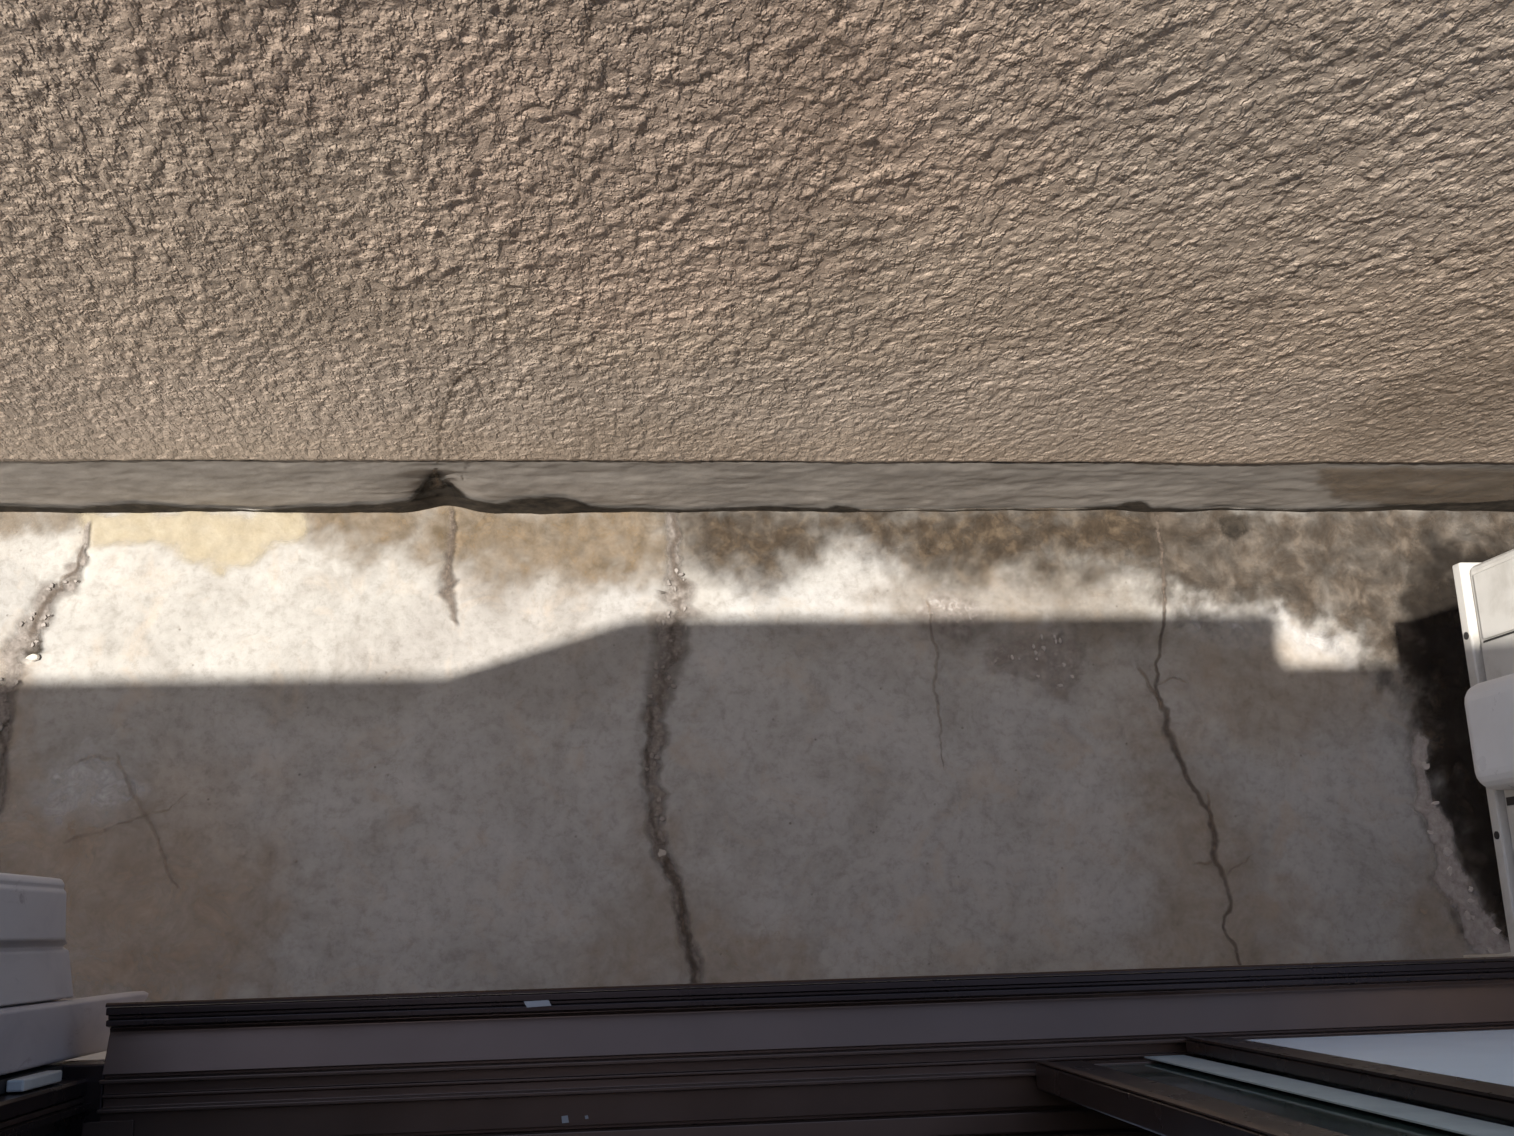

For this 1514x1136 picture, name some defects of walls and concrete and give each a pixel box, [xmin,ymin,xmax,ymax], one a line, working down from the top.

crack [575,0,601,204]
crack [0,273,1514,983]
damp [311,467,1514,942]
peeling [1412,732,1511,954]